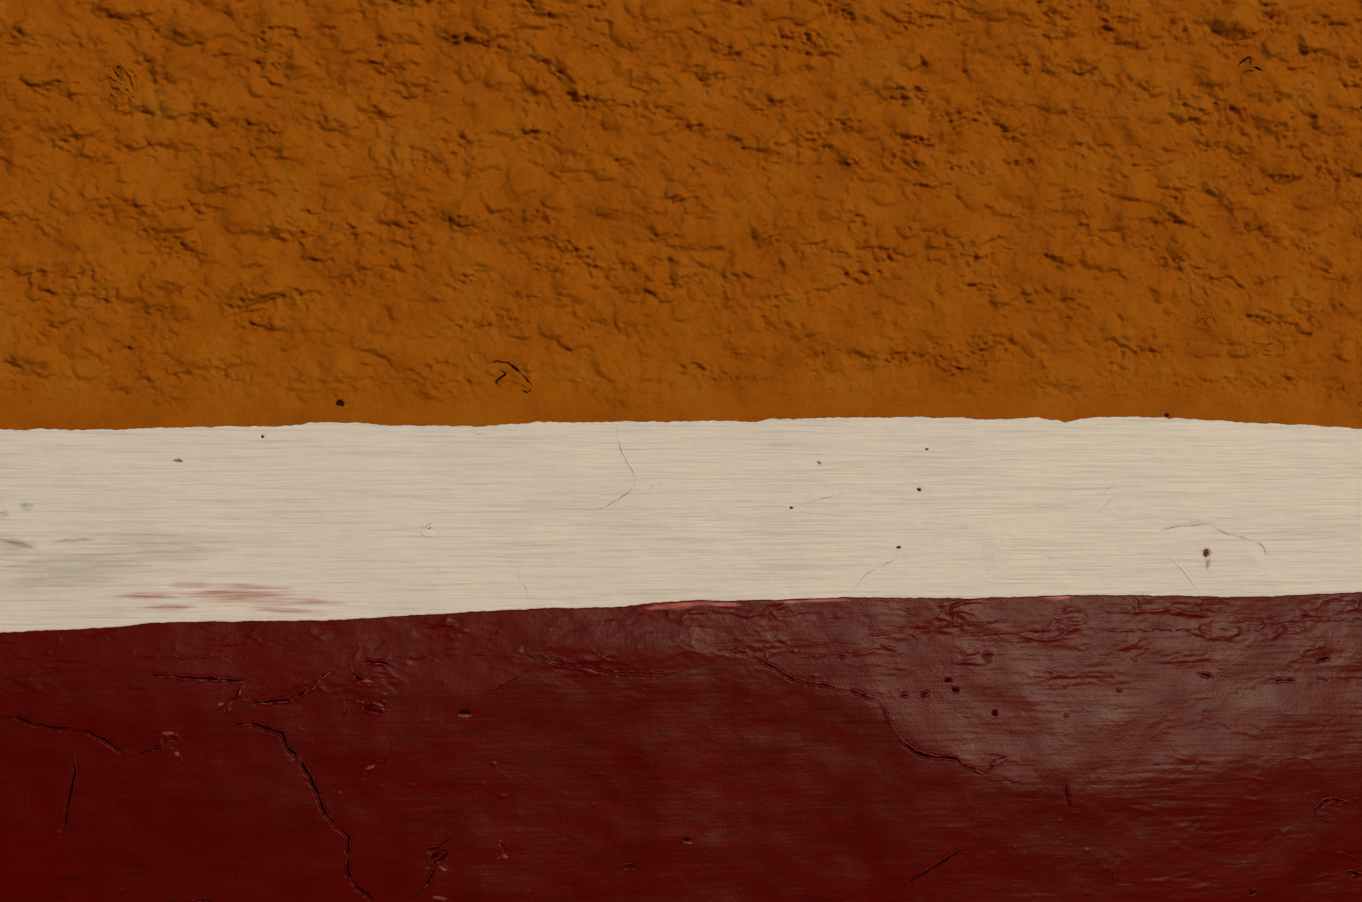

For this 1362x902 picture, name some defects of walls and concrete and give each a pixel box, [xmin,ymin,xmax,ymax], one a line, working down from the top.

crack [0,659,399,902]